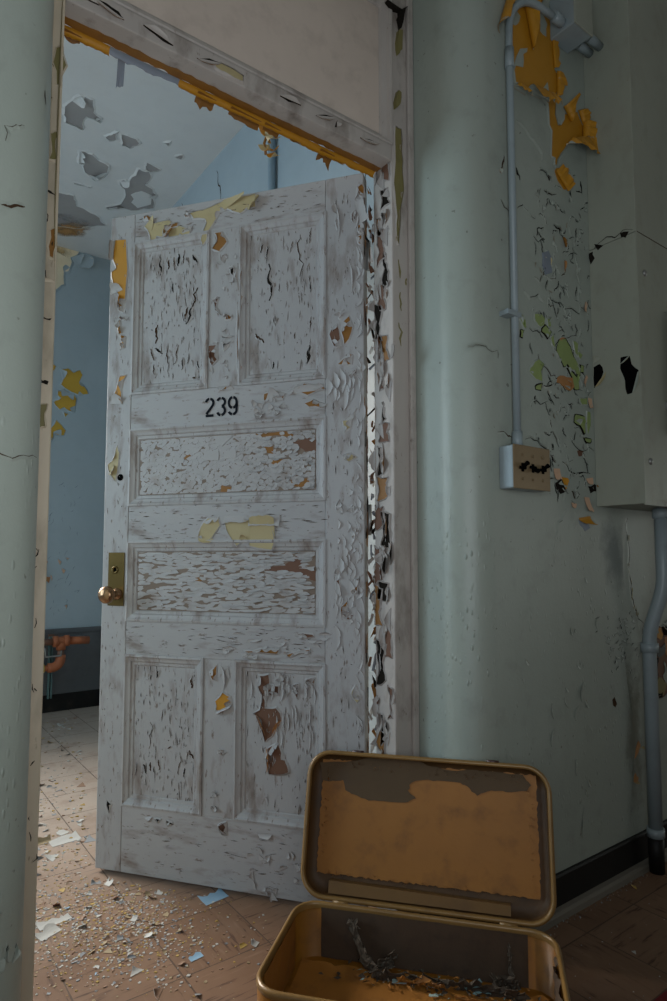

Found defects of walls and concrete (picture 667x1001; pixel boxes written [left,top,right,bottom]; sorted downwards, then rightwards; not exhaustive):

peeling [498,0,600,191]
peeling [35,0,408,754]
peeling [519,313,606,456]
crack [0,453,37,462]
peeling [554,468,569,494]
peeling [571,478,599,531]
spalling [657,622,667,699]
peeling [250,673,316,776]